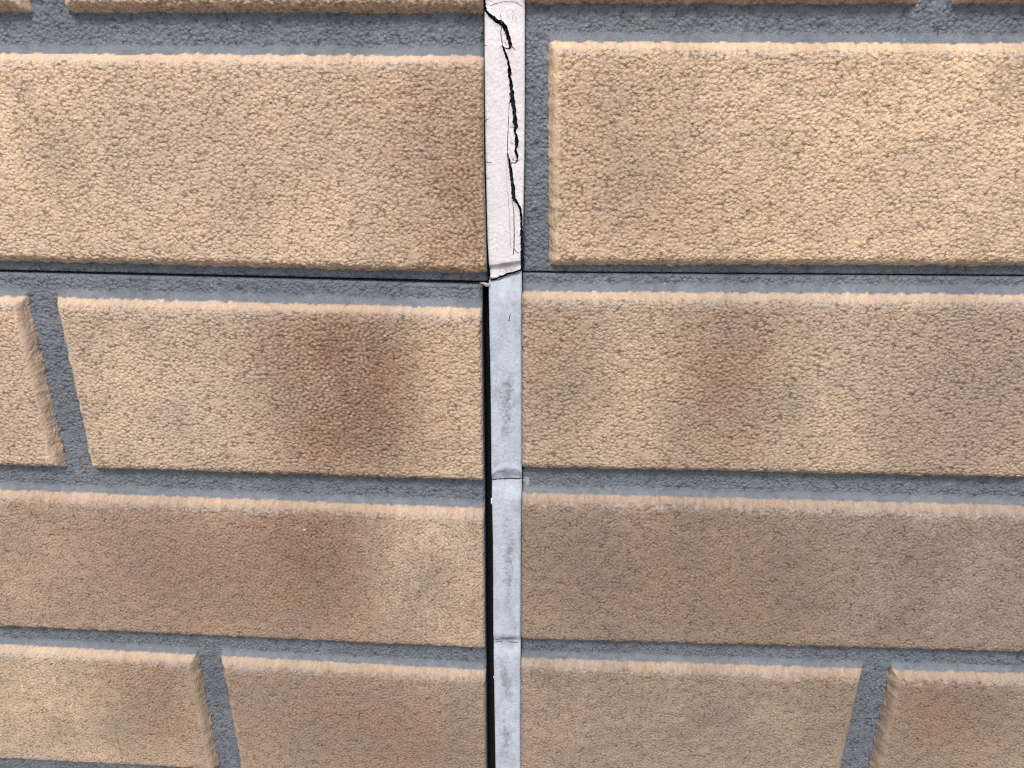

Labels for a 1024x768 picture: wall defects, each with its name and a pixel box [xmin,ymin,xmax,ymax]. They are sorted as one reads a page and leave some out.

crack [484,0,524,278]